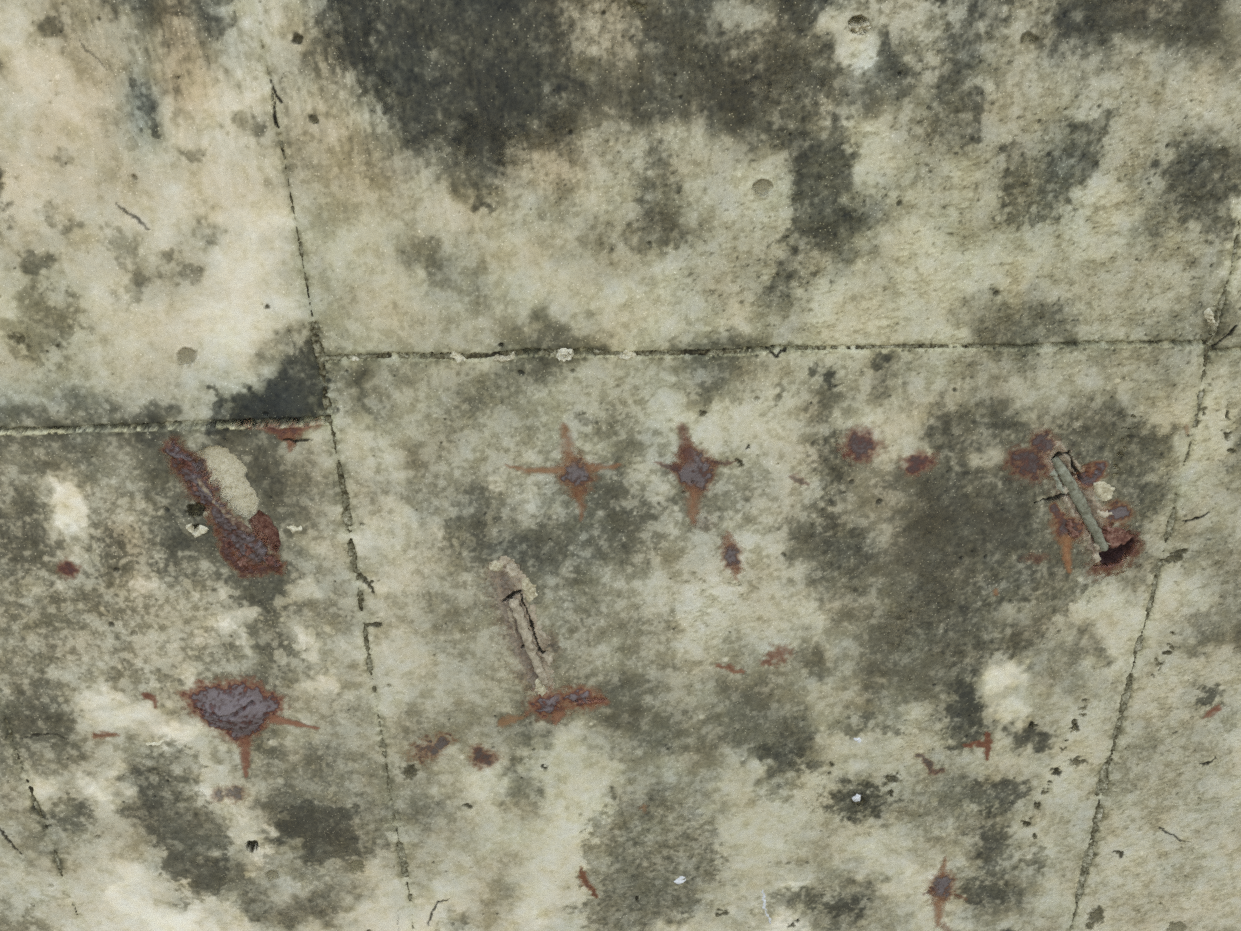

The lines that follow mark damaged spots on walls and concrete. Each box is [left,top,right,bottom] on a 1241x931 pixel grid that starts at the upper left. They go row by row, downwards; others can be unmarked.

water stain [316,0,592,212]
water stain [611,140,688,254]
water stain [676,0,862,296]
water stain [802,31,901,85]
spalling [163,440,302,577]
corrosion [505,424,621,518]
corrosion [659,425,733,523]
water stain [807,431,875,592]
water stain [892,404,1169,669]
spalling [1006,427,1140,574]
spalling [487,556,555,696]
corrosion [923,859,966,926]